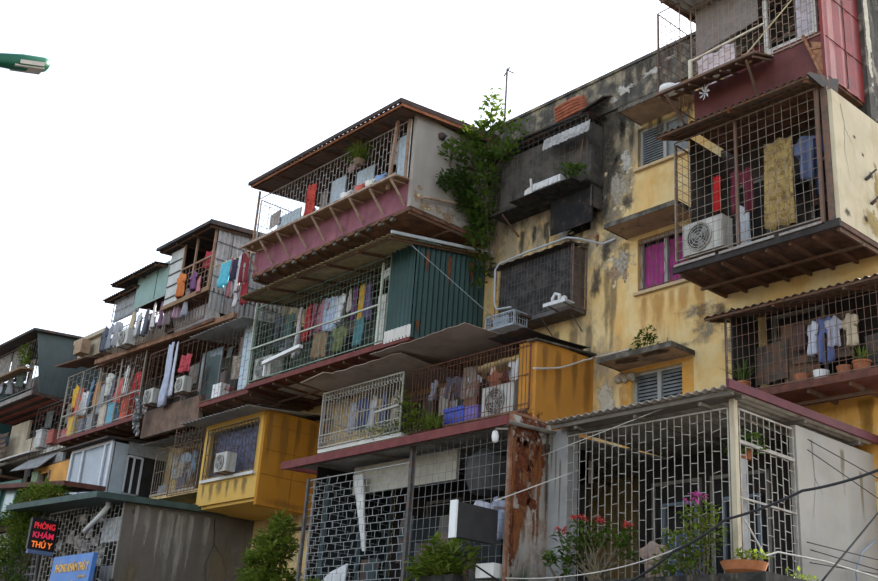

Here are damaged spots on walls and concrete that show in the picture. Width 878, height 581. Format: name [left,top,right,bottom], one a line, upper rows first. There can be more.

peeling [609,67,657,104]
damp [520,222,549,252]
damp [570,111,635,324]
peeling [603,248,636,289]
corrosion [508,409,550,577]